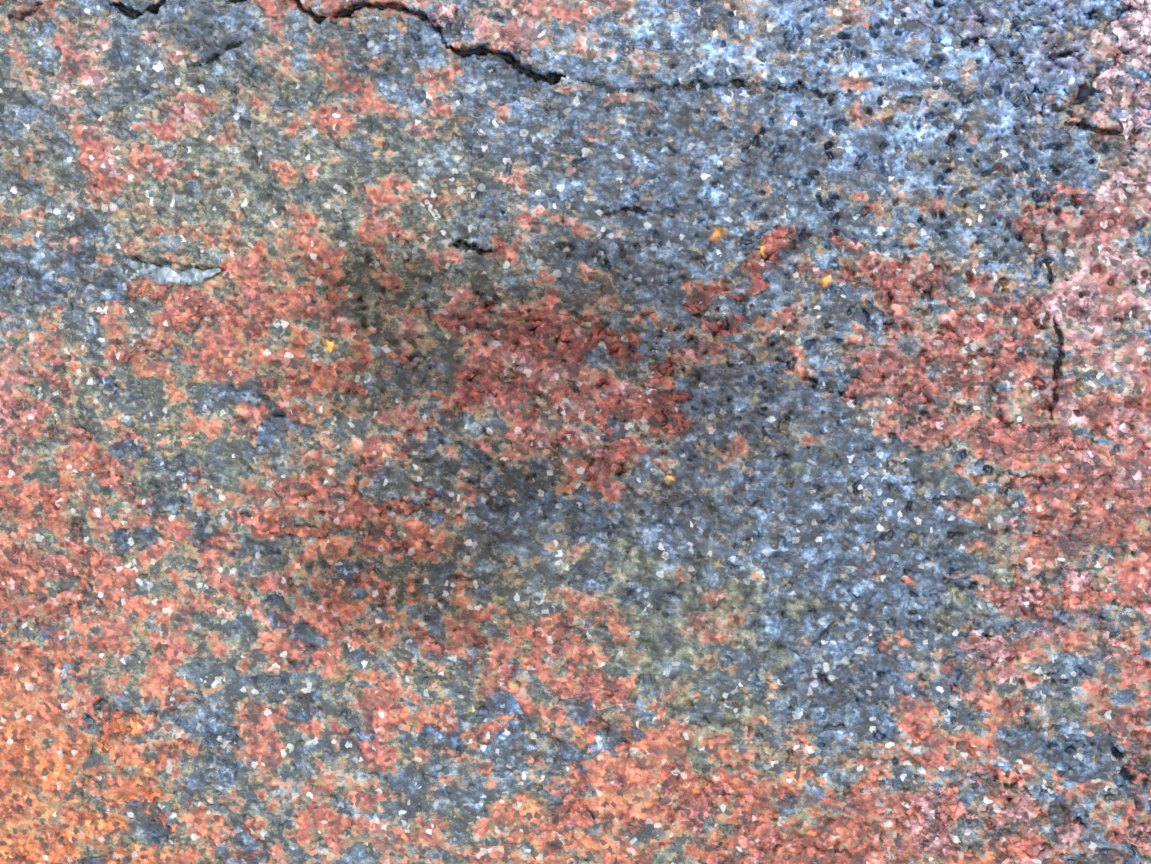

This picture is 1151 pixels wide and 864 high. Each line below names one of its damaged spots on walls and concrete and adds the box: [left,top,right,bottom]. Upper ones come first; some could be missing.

crack [113,0,166,17]
crack [297,0,566,83]
crack [207,42,241,63]
crack [600,83,706,93]
crack [733,81,851,98]